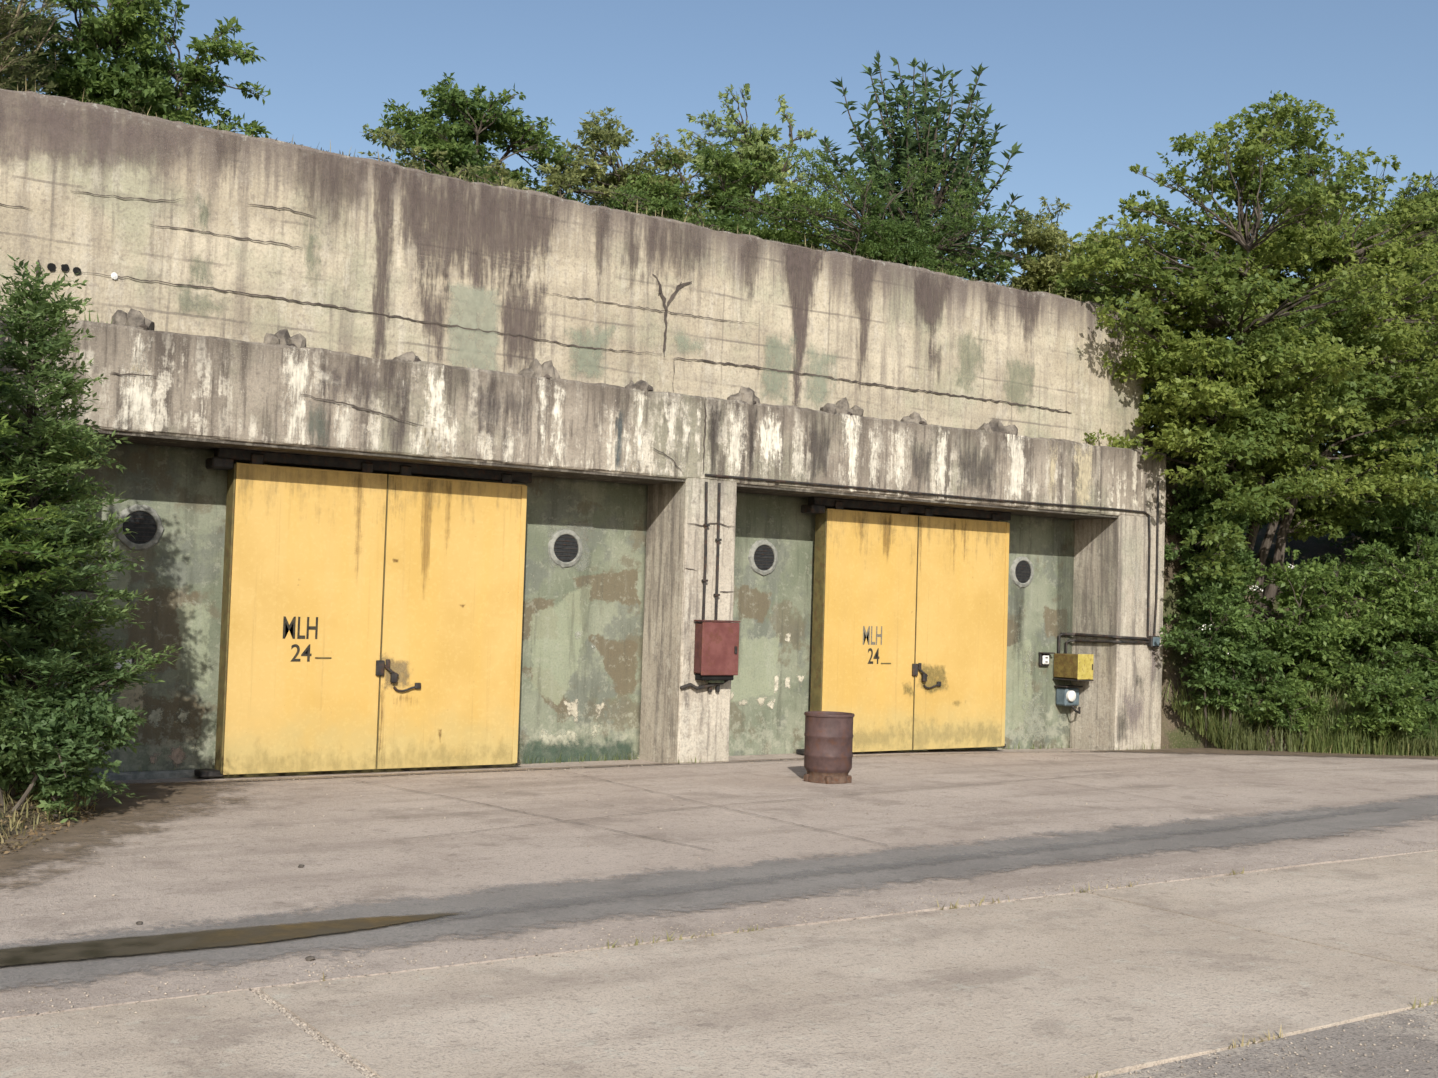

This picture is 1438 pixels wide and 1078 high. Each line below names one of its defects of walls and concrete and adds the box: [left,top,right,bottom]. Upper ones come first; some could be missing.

spalling [111,308,155,331]
water stain [114,335,155,432]
water stain [283,352,405,447]
water stain [370,166,554,456]
water stain [480,380,565,467]
crack [80,271,1071,472]
water stain [607,393,878,492]
water stain [785,244,823,407]
water stain [852,257,877,386]
water stain [915,272,949,367]
water stain [894,430,1026,506]
peeling [116,681,189,727]